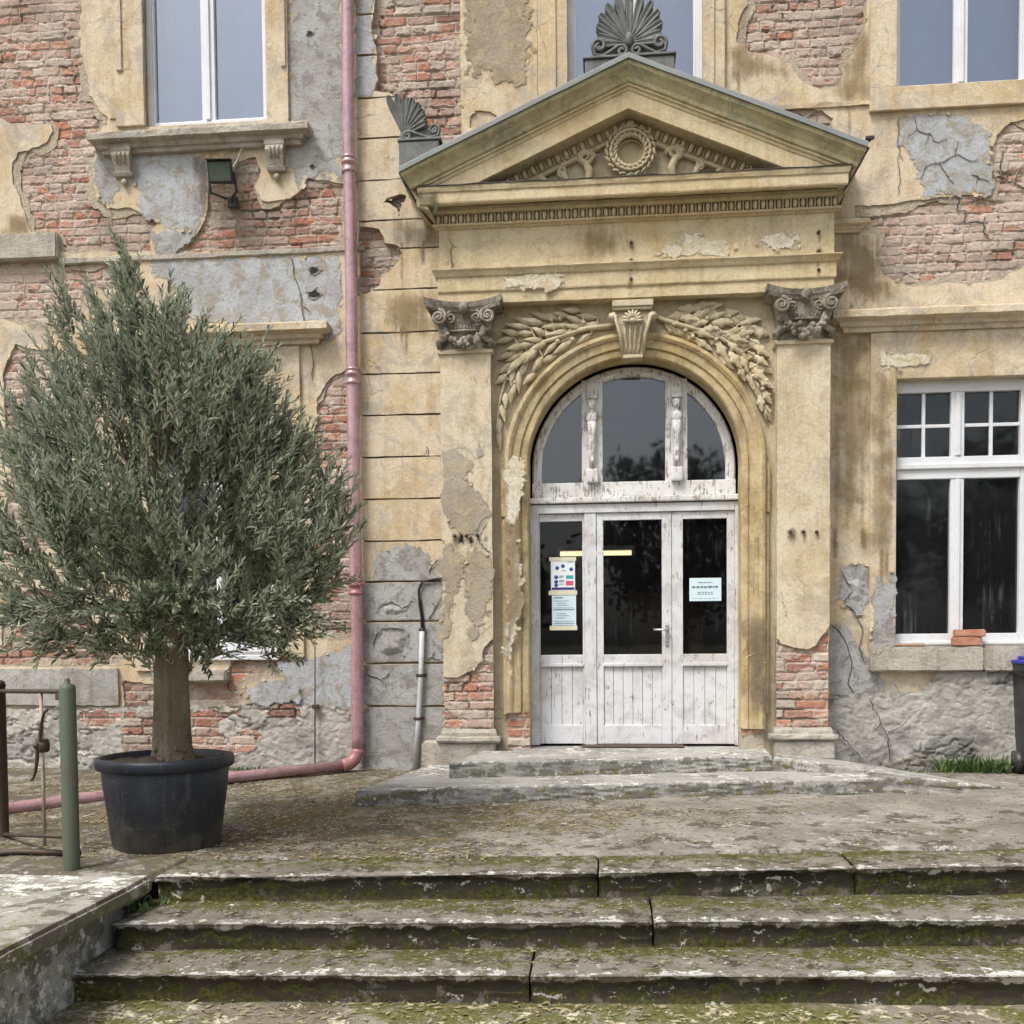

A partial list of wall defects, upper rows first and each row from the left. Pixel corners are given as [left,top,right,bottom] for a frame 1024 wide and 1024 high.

spalling [745,0,867,89]
spalling [0,0,538,348]
spalling [859,111,1024,285]
crack [897,116,1024,238]
spalling [77,681,154,752]
peeling [189,372,530,770]
spalling [741,562,898,736]
crack [830,571,908,762]